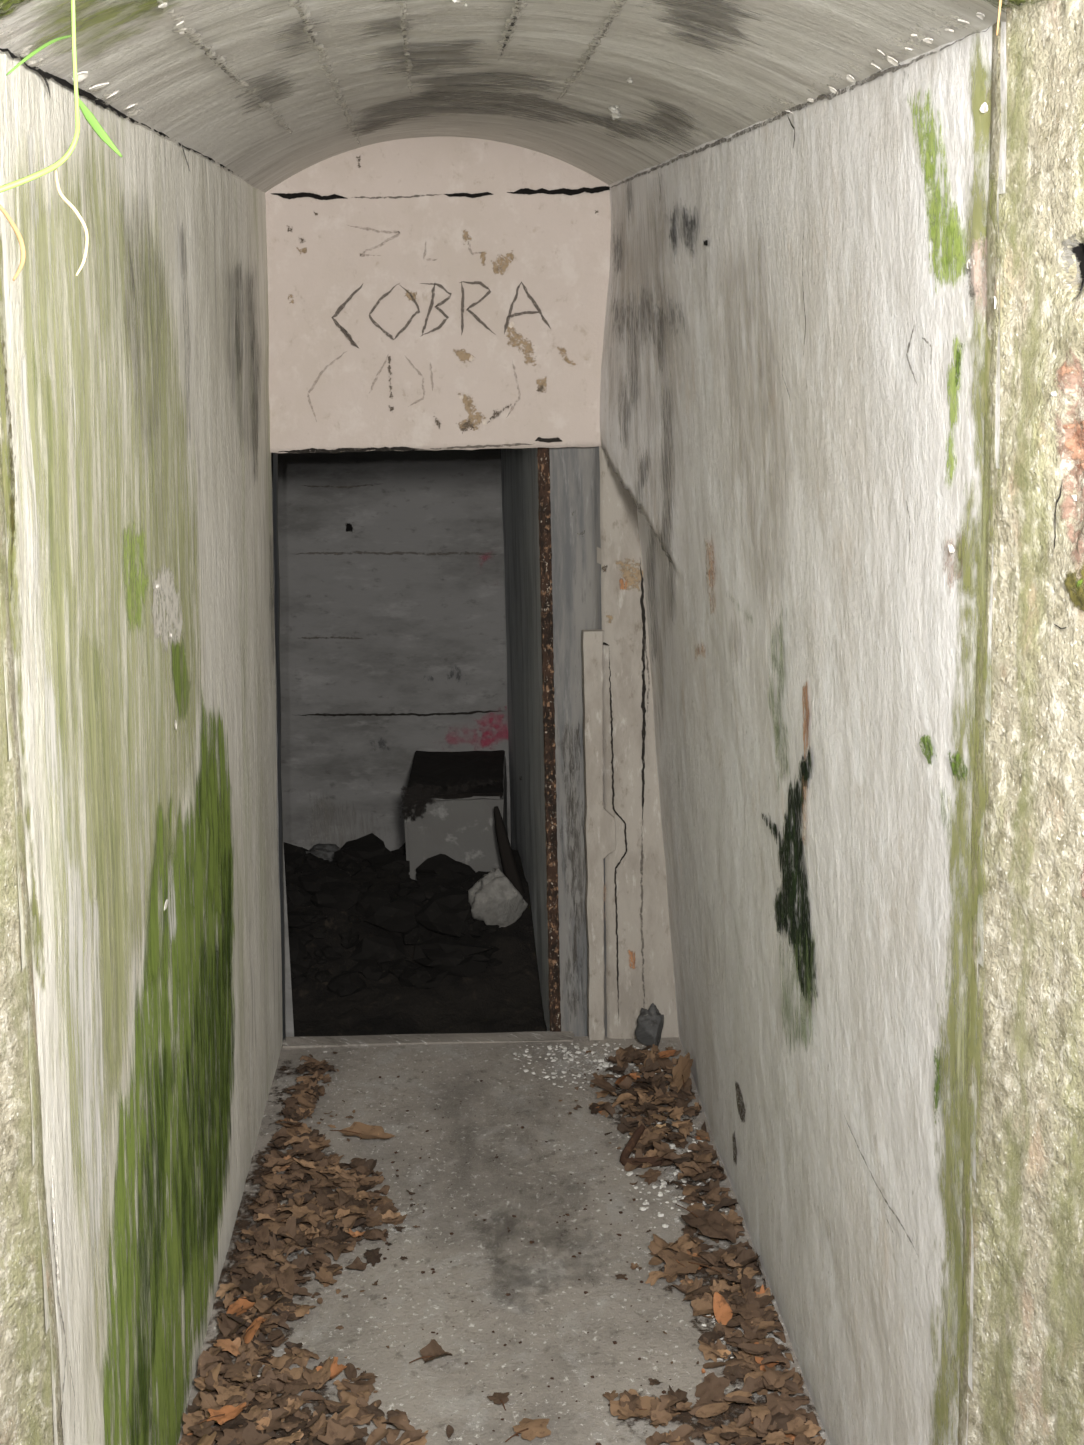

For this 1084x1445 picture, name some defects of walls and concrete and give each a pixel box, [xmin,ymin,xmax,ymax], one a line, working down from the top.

crack [0,48,233,172]
leakage [230,15,327,114]
crack [498,0,527,60]
leakage [346,19,695,153]
crack [271,28,989,204]
leakage [642,0,759,54]
leakage [925,133,960,274]
leakage [762,814,780,843]
leakage [131,637,235,1445]